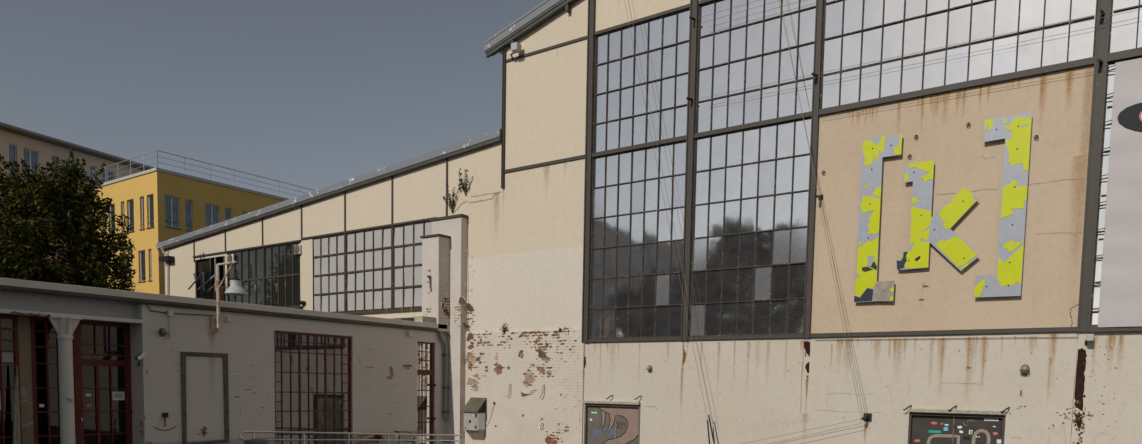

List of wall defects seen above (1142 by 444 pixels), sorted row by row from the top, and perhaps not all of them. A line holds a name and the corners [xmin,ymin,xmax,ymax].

peeling [426,250,580,444]
corrosion [801,340,810,389]
corrosion [1073,348,1087,444]